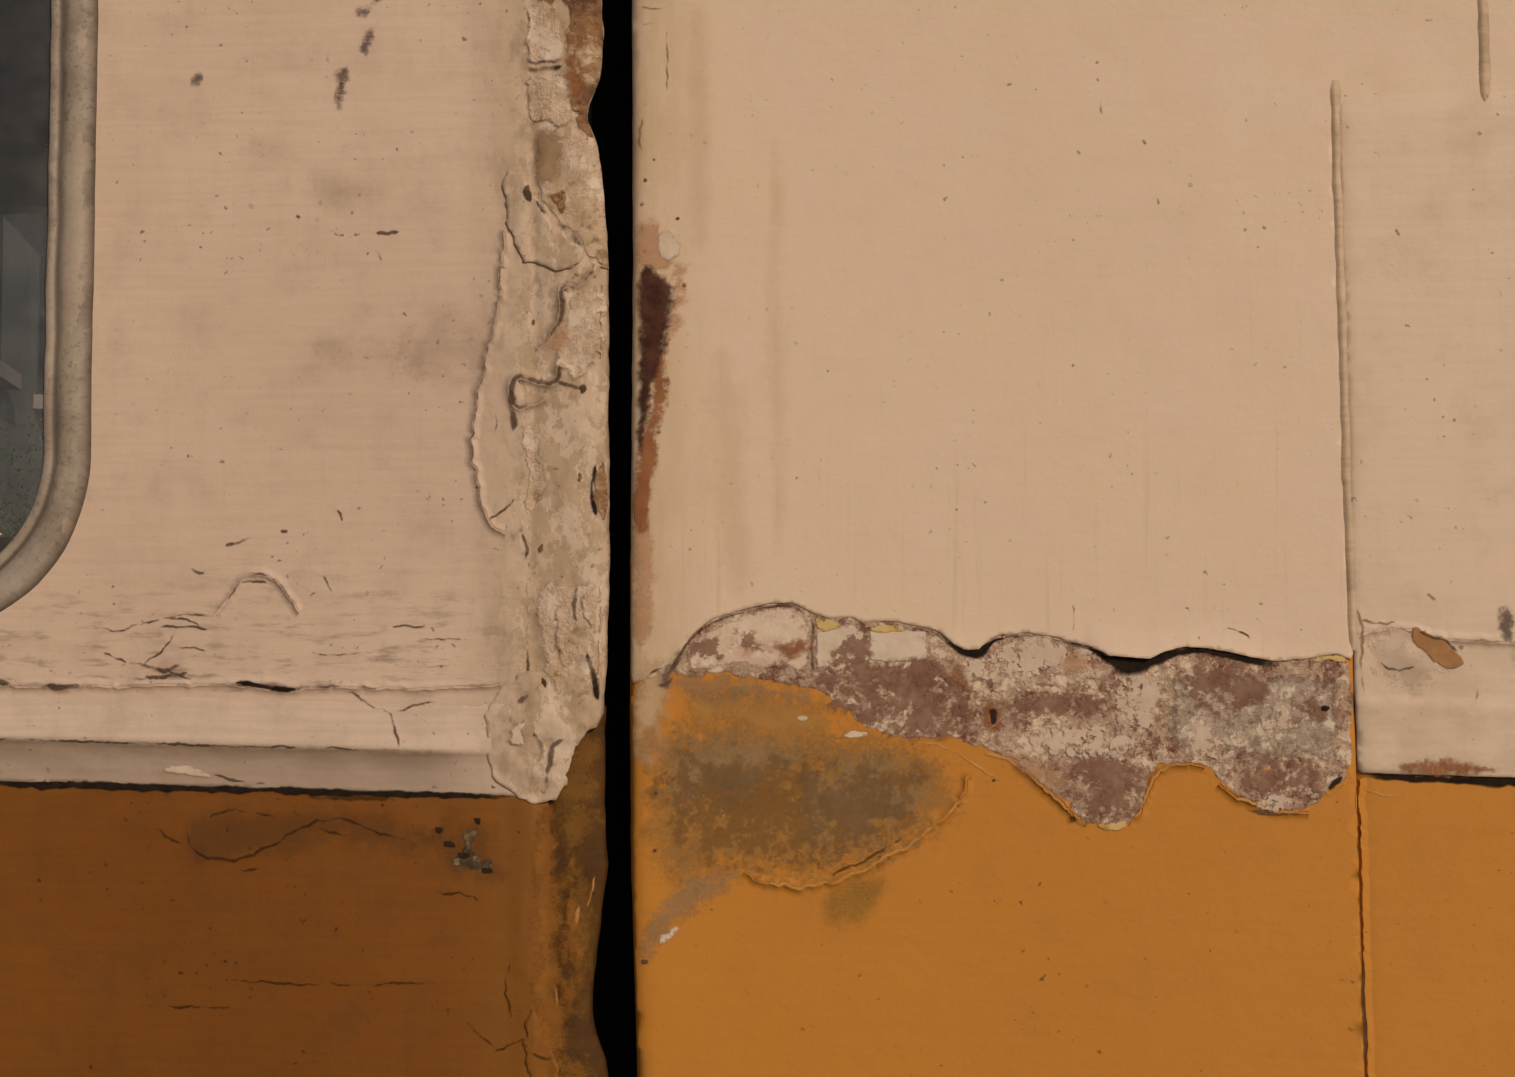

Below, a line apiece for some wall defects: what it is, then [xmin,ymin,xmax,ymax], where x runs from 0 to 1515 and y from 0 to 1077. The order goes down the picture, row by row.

peeling [502,0,609,271]
peeling [521,424,547,511]
peeling [578,463,608,519]
rust [632,217,686,645]
crack [0,738,357,750]
crack [0,565,530,744]
peeling [536,581,604,706]
spalling [634,603,1353,832]
peeling [1367,624,1464,694]
crack [0,781,497,871]